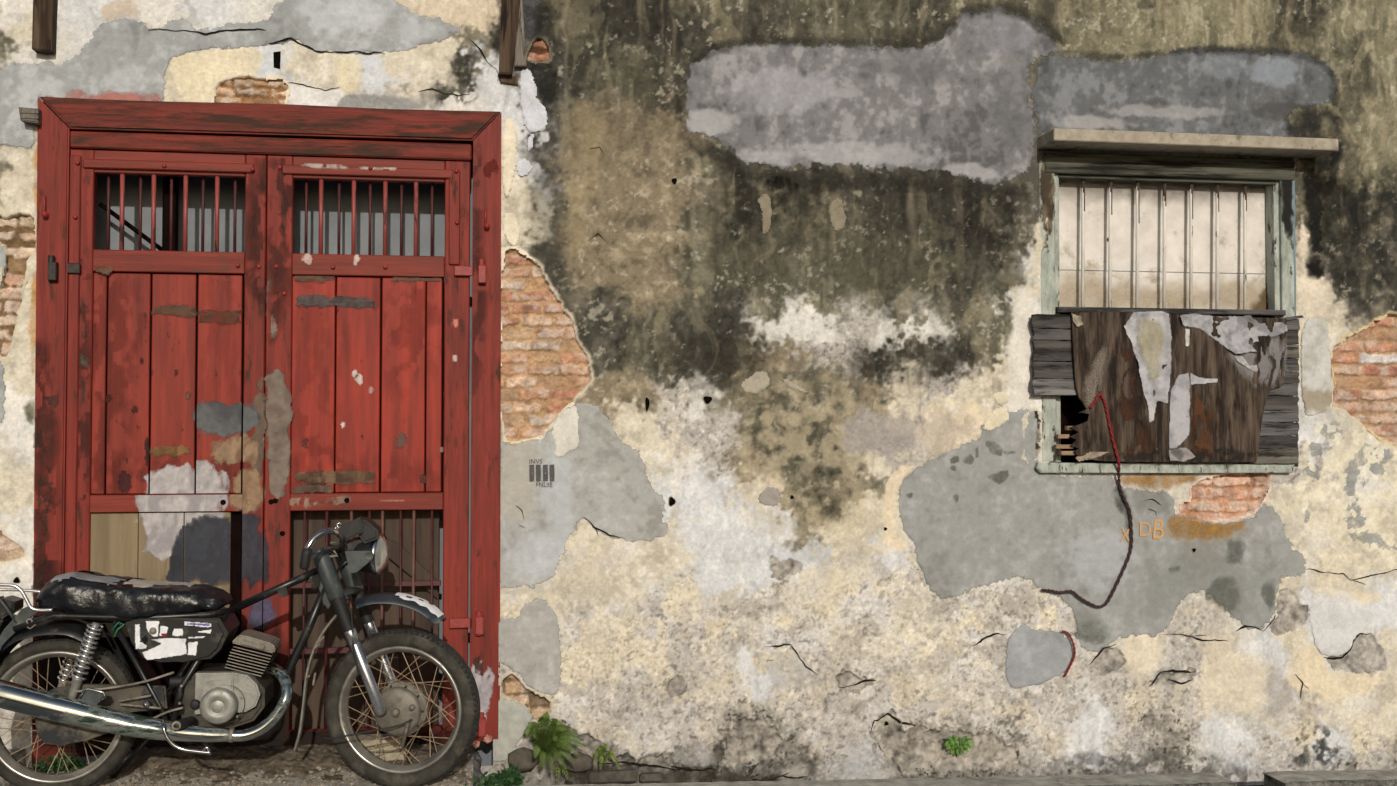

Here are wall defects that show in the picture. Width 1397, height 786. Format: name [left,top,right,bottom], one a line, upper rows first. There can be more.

crack [150,28,384,54]
water stain [966,4,1062,43]
water stain [1174,46,1291,54]
water stain [526,63,557,101]
water stain [1287,61,1397,285]
spalling [484,40,590,458]
spalling [0,214,37,358]
spalling [1331,315,1397,446]
water stain [950,442,1008,483]
spalling [1179,473,1271,521]
spalling [0,531,47,619]
crack [1312,569,1397,585]